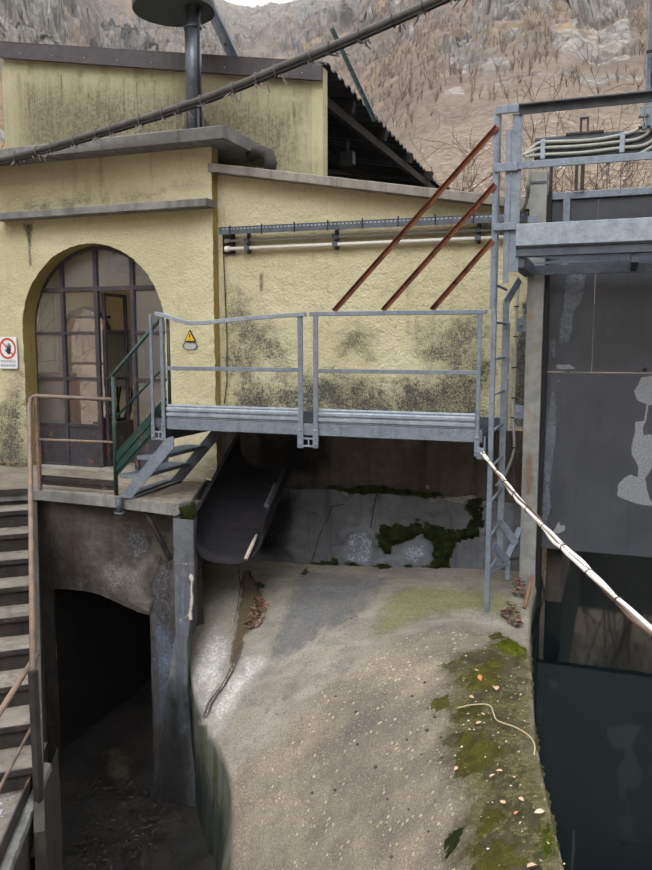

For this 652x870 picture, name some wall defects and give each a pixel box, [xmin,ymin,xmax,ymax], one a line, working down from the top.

damp [228,297,490,417]
peeling [542,274,585,533]
peeling [617,376,652,506]
damp [148,573,194,807]
damp [195,627,266,724]